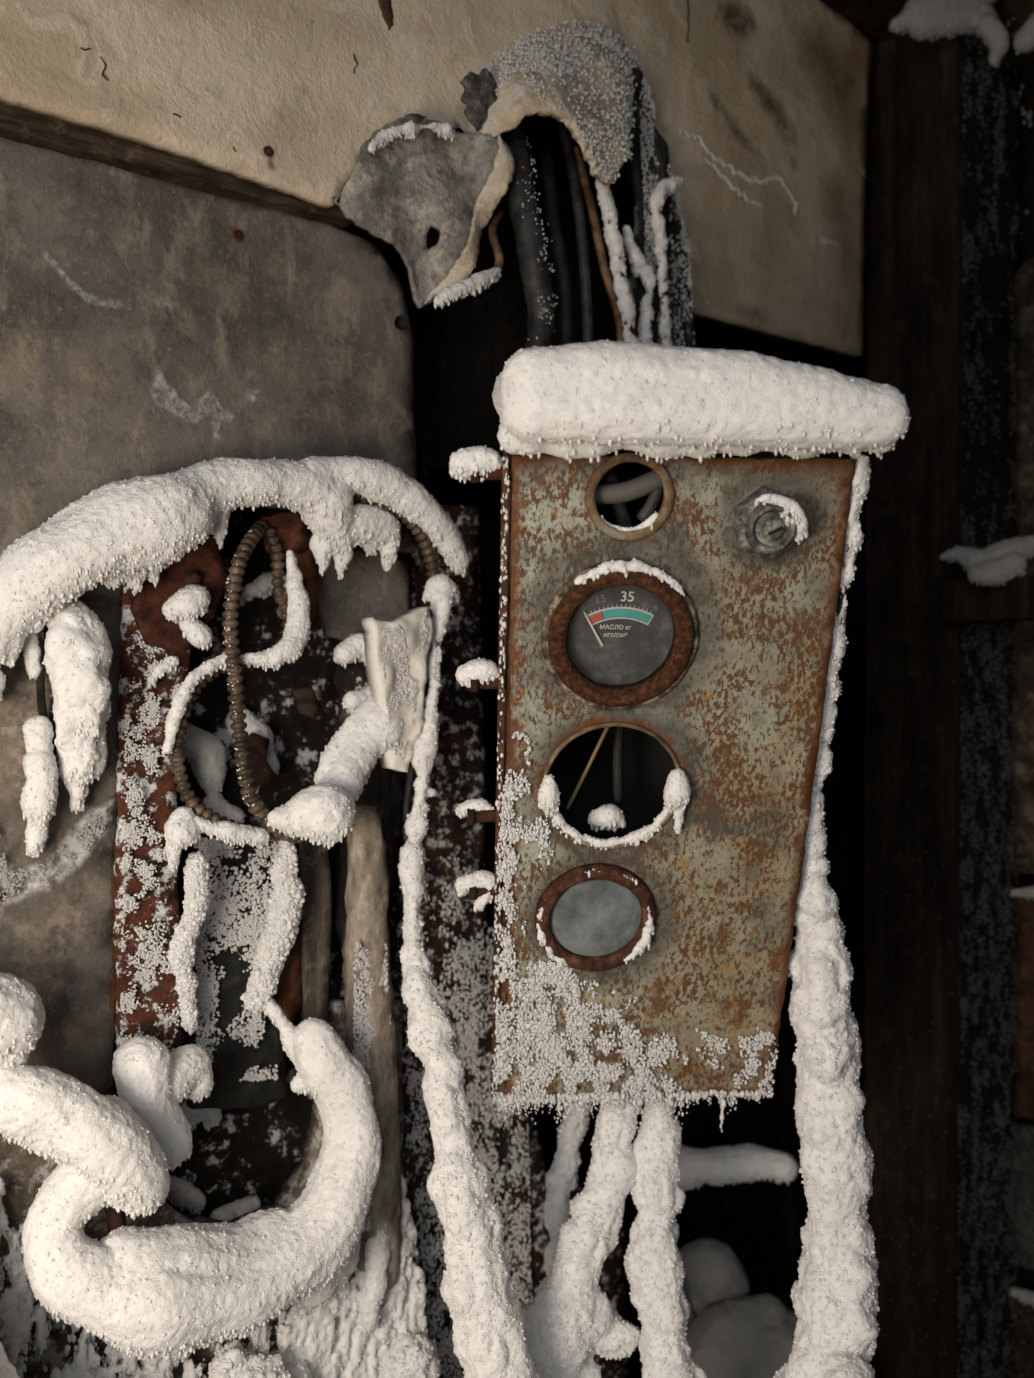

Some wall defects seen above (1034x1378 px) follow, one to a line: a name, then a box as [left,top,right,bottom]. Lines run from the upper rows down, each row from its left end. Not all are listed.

peeling [332,113,515,309]
corrosion [259,511,319,619]
corrosion [246,733,278,786]